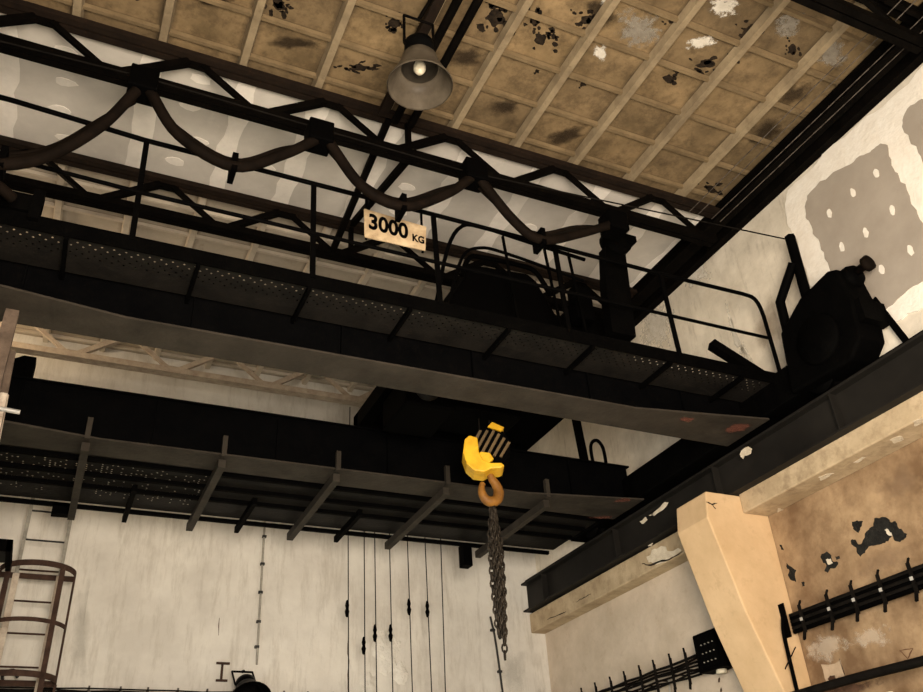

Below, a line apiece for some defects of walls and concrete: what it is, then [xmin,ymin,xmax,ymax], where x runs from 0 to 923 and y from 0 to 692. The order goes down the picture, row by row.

peeling [265,0,294,19]
peeling [476,2,508,33]
peeling [513,7,559,53]
peeling [851,517,907,557]
spalling [642,543,682,566]
peeling [821,552,840,573]
peeling [786,563,805,586]